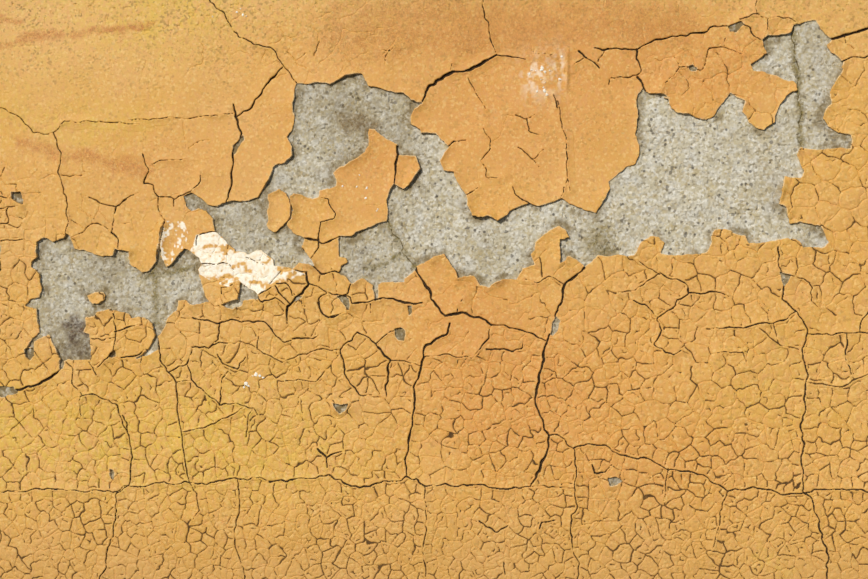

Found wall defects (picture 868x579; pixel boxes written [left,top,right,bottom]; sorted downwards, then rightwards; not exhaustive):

peeling [11,191,23,204]
crack [0,0,297,249]
crack [392,146,400,184]
peeling [25,21,852,370]
crack [422,0,553,195]
crack [554,95,569,196]
crack [574,1,868,219]
peeling [0,386,18,397]
crack [0,198,868,579]